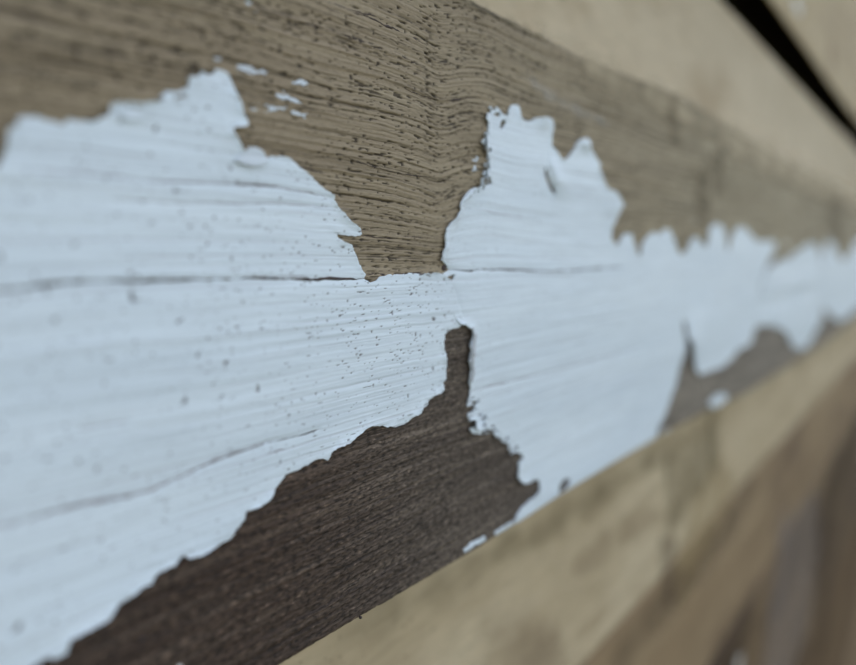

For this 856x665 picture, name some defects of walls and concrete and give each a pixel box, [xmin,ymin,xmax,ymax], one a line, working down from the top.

peeling [0,69,464,665]
crack [0,267,623,292]
peeling [441,105,856,523]